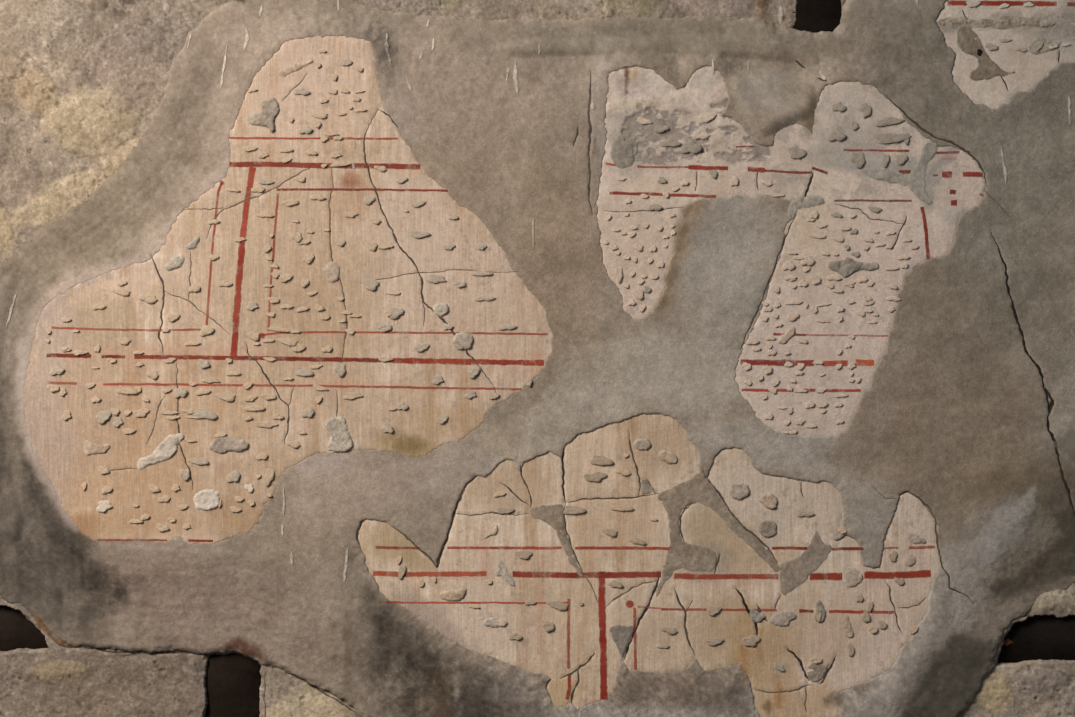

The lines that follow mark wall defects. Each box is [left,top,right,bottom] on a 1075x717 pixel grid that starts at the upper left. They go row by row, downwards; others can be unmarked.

spalling [937,15,1062,81]
spalling [249,97,280,133]
crack [363,110,518,392]
spalling [828,257,879,278]
crack [146,164,348,490]
crack [888,98,1075,515]
spalling [209,436,250,454]
spalling [193,489,220,511]
crack [394,466,532,567]
crack [561,438,695,661]
spalling [729,483,778,538]
crack [755,648,836,710]